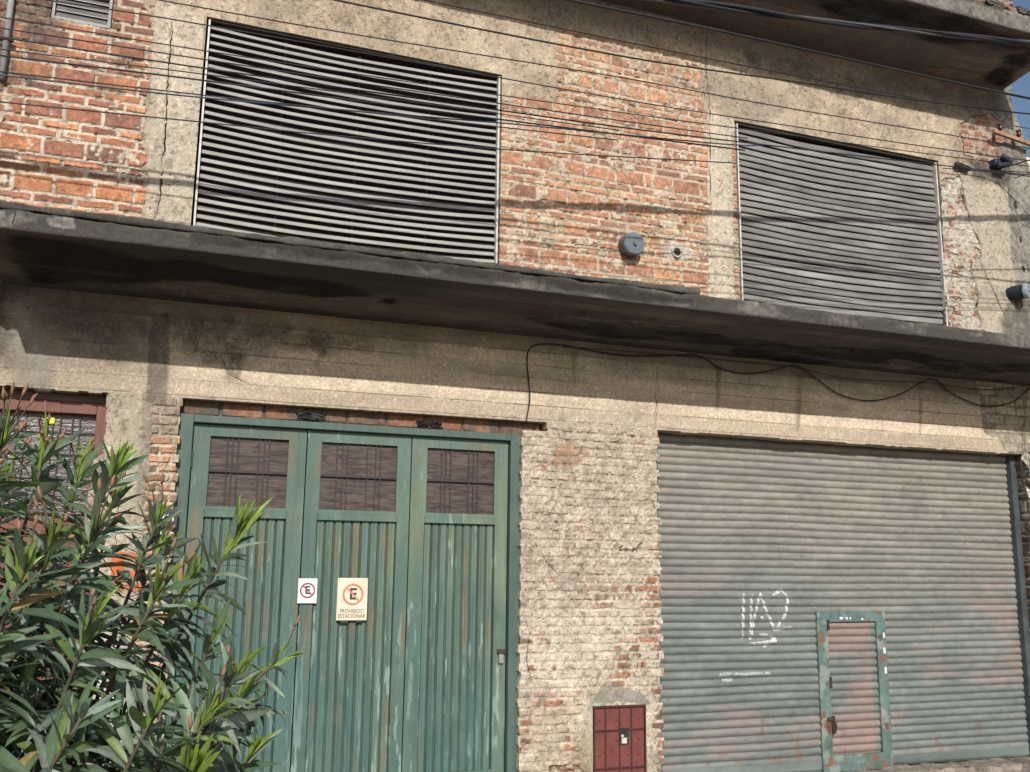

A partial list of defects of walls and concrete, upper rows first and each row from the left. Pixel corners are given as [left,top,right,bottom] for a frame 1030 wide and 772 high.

water stain [774,0,1030,113]
flaking render [960,113,1005,164]
water stain [10,237,370,311]
spalling [671,246,682,258]
flaking render [940,176,982,330]
water stain [8,295,50,385]
water stain [148,314,169,401]
spalling [548,762,583,772]